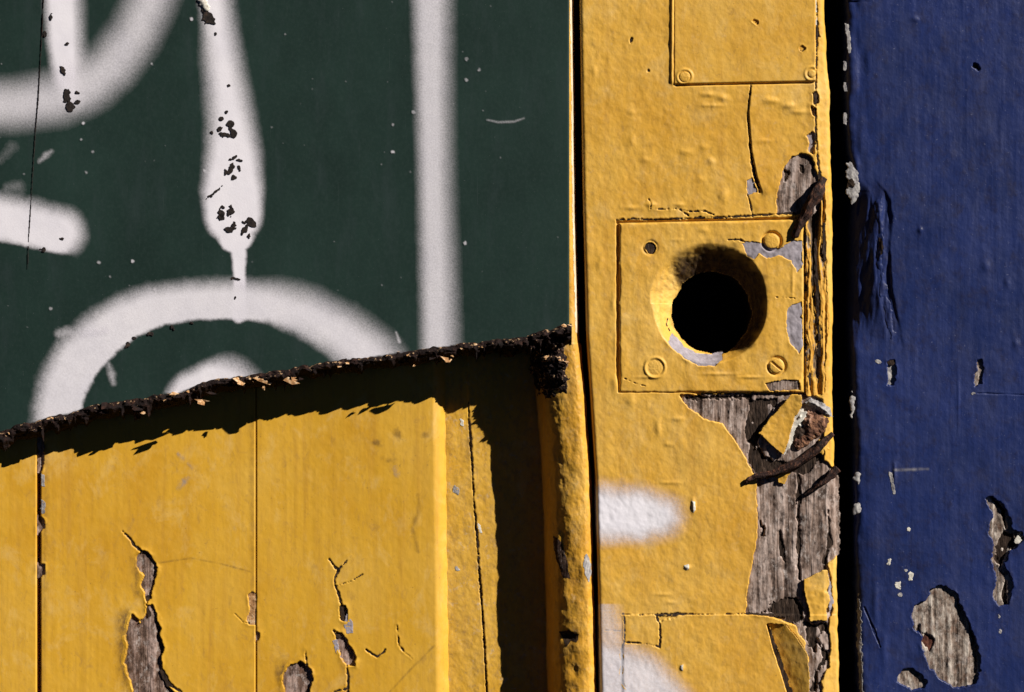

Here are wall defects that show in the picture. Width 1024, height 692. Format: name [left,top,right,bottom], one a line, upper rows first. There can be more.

crack [616,85,796,221]
peeling [776,154,820,217]
spalling [846,162,860,205]
peeling [727,239,803,272]
peeling [786,302,803,353]
peeling [680,392,861,692]
peeling [985,496,1023,634]
peeling [120,531,182,692]
spalling [246,592,260,642]
peeling [897,585,980,690]
peeling [281,653,313,692]